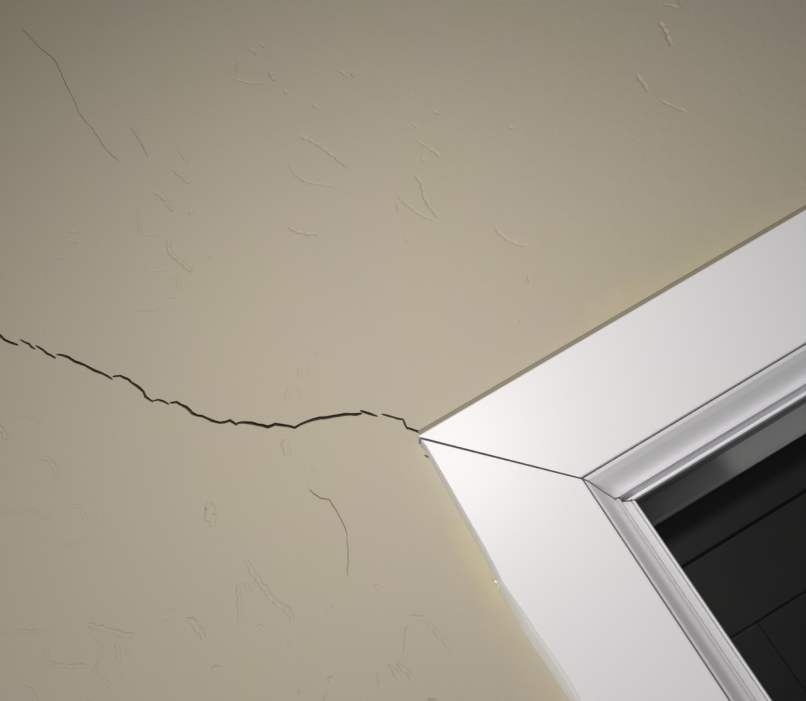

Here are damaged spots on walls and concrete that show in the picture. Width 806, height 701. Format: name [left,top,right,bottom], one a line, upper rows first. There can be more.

crack [0,334,632,502]